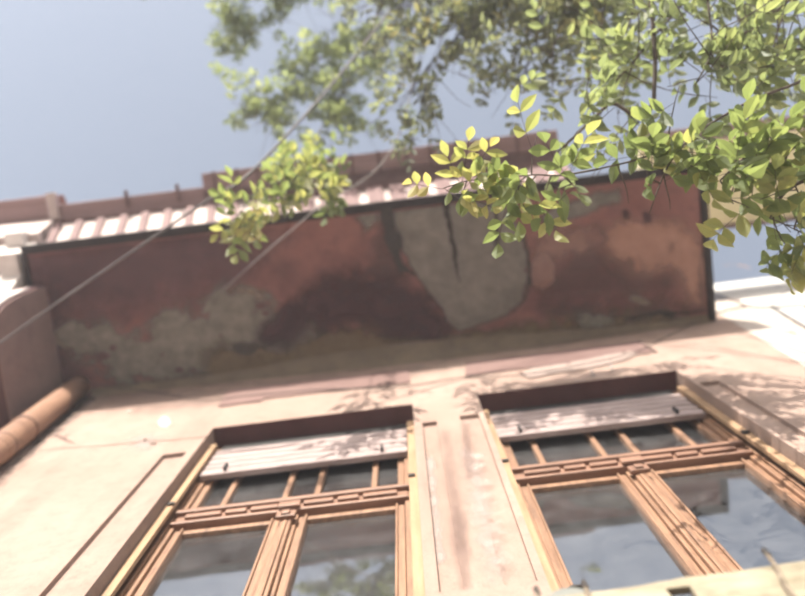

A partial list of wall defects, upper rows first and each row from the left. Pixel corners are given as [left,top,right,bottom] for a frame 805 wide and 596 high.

spalling [54,286,325,386]
water stain [259,227,451,343]
crack [443,203,460,284]
spalling [393,189,706,331]